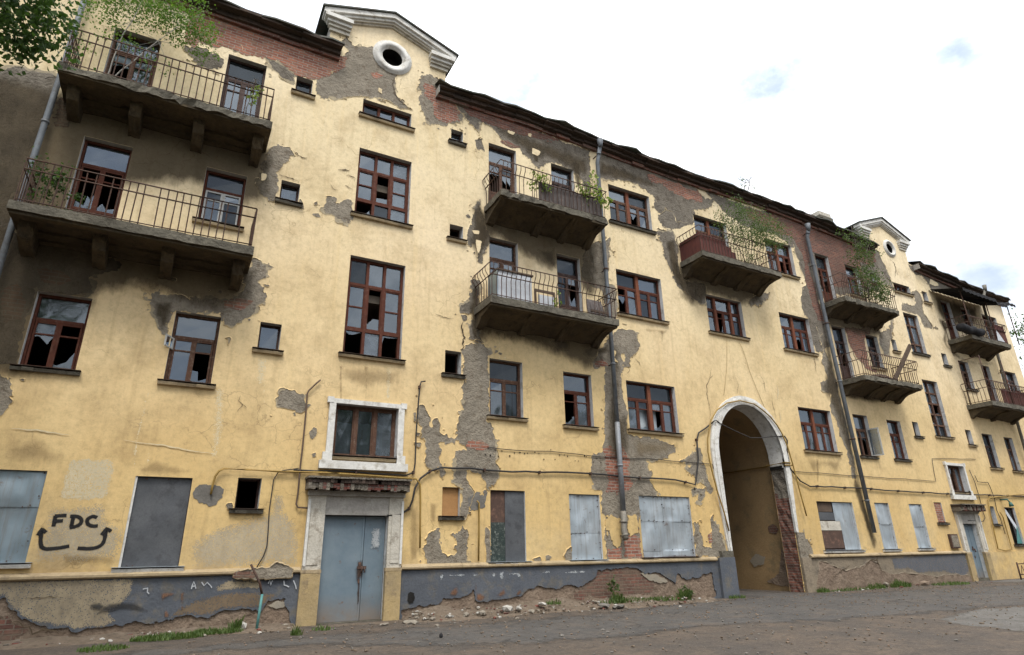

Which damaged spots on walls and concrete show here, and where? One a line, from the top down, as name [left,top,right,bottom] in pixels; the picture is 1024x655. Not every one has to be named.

peeling [141,257,274,345]
peeling [193,484,234,511]
peeling [413,275,503,564]
flaking render [169,3,893,479]
peeling [584,236,727,559]